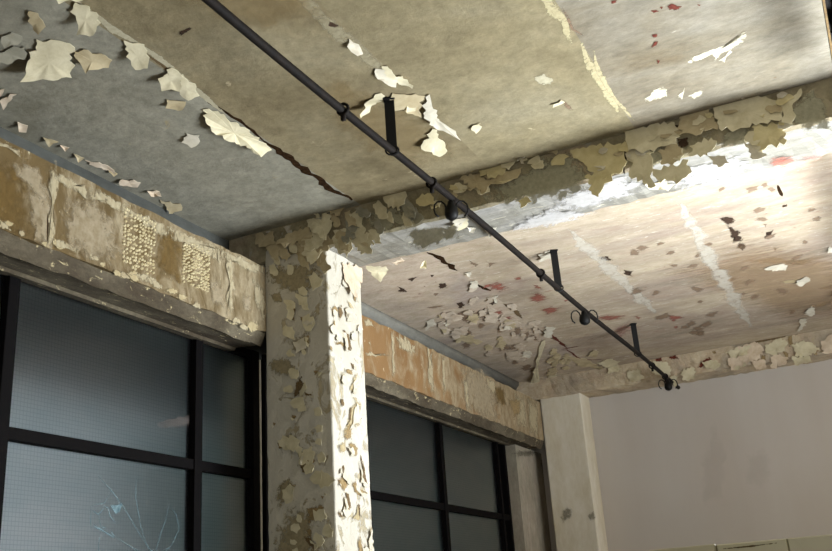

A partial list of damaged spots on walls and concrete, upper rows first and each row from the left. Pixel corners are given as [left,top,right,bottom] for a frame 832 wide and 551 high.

peeling [0,11,112,82]
peeling [57,0,100,36]
peeling [124,41,150,70]
peeling [158,68,199,111]
peeling [203,109,271,157]
crack [207,102,353,200]
peeling [347,39,363,56]
peeling [360,66,461,157]
peeling [449,88,831,231]
spalling [720,217,746,250]
peeling [425,260,832,387]
peeling [255,191,497,551]